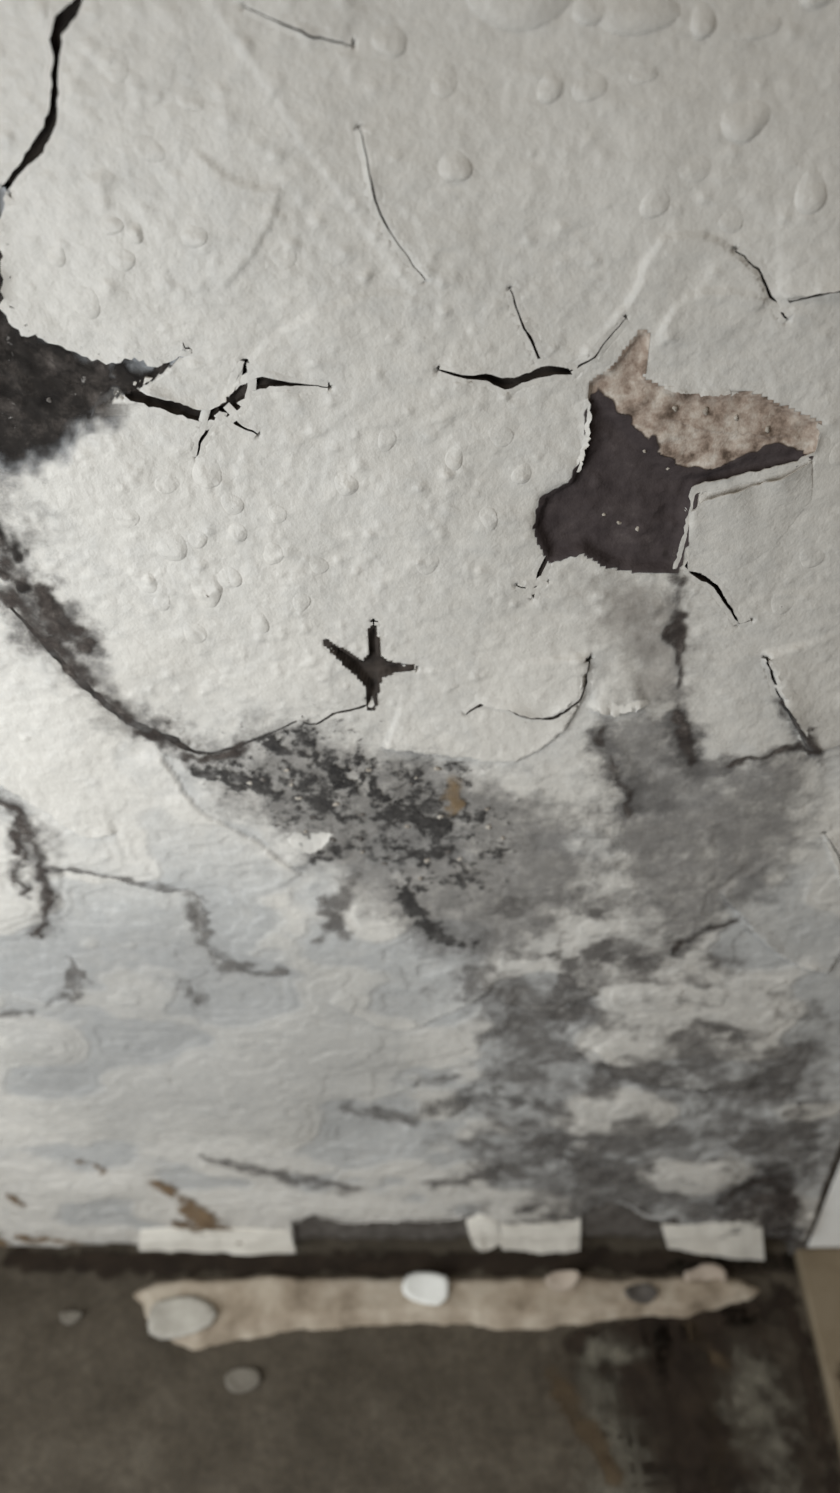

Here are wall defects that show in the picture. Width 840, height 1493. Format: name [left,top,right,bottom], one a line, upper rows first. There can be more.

crack [0,0,93,196]
crack [242,0,352,54]
peeling [0,416,113,473]
water stain [0,251,169,467]
peeling [0,187,244,410]
crack [115,359,328,458]
spalling [532,330,832,574]
crack [5,607,416,759]
water stain [0,530,839,1241]
peeling [147,1296,217,1340]
peeling [138,1198,765,1291]
peeling [624,1283,658,1304]